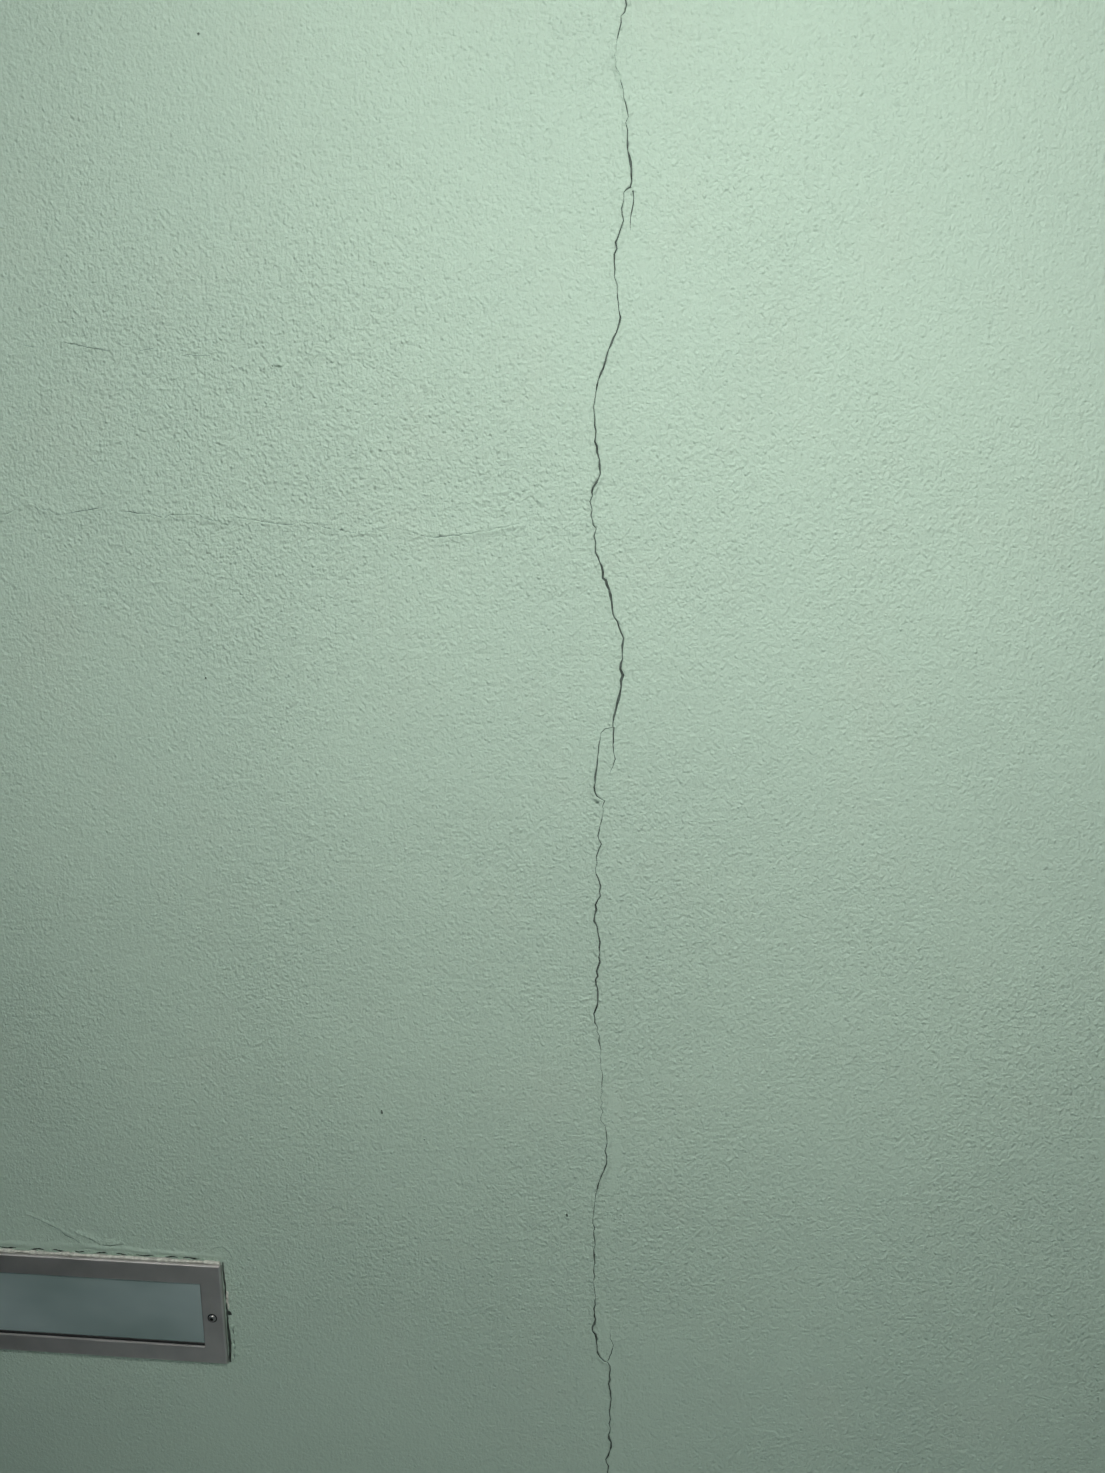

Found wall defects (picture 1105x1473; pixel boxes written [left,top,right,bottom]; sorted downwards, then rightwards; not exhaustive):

crack [582,0,639,1473]